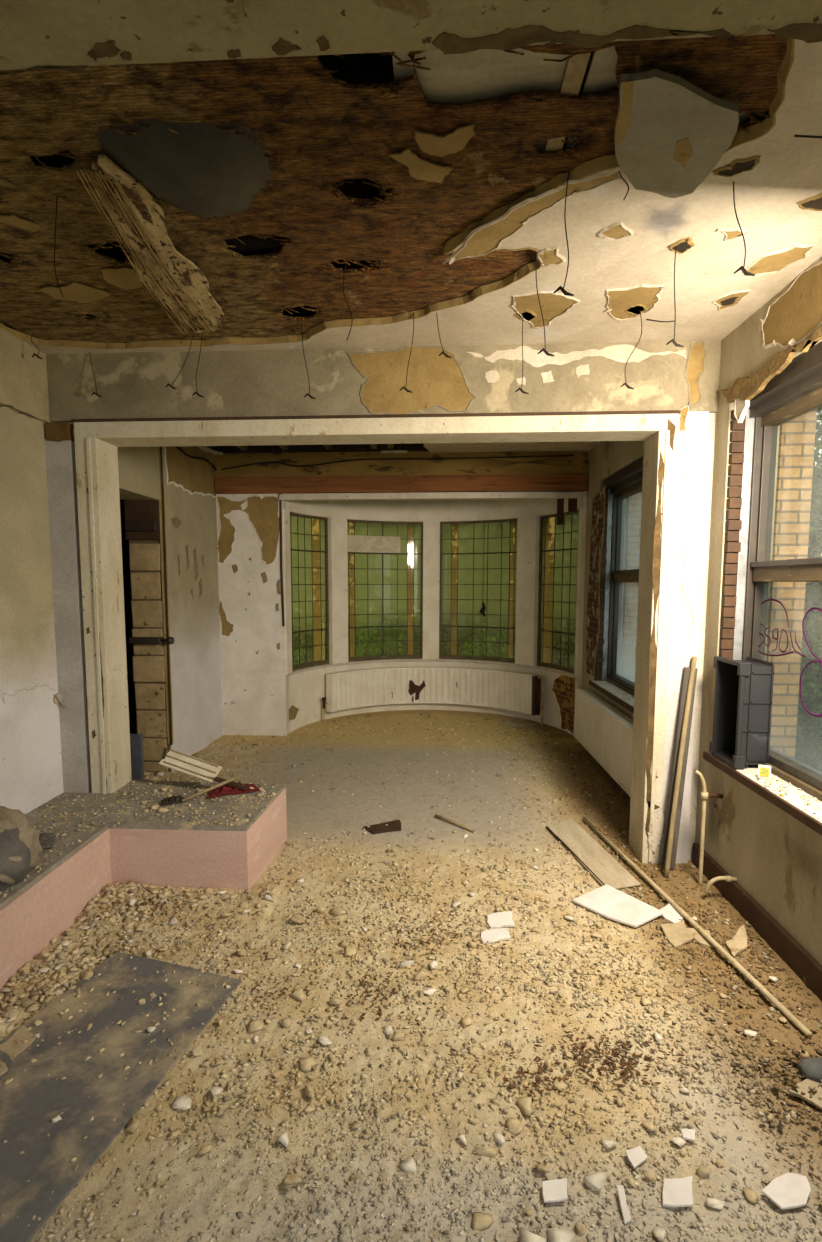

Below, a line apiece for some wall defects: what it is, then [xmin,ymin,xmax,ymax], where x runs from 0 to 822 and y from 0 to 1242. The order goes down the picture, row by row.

spalling [0,41,132,76]
spalling [712,155,761,177]
peeling [442,167,625,267]
peeling [597,222,634,240]
spalling [668,237,695,254]
spalling [796,193,822,211]
peeling [511,290,581,329]
peeling [604,284,665,321]
peeling [712,244,822,423]
peeling [164,446,281,612]
peeling [346,341,706,853]
peeling [219,599,235,638]